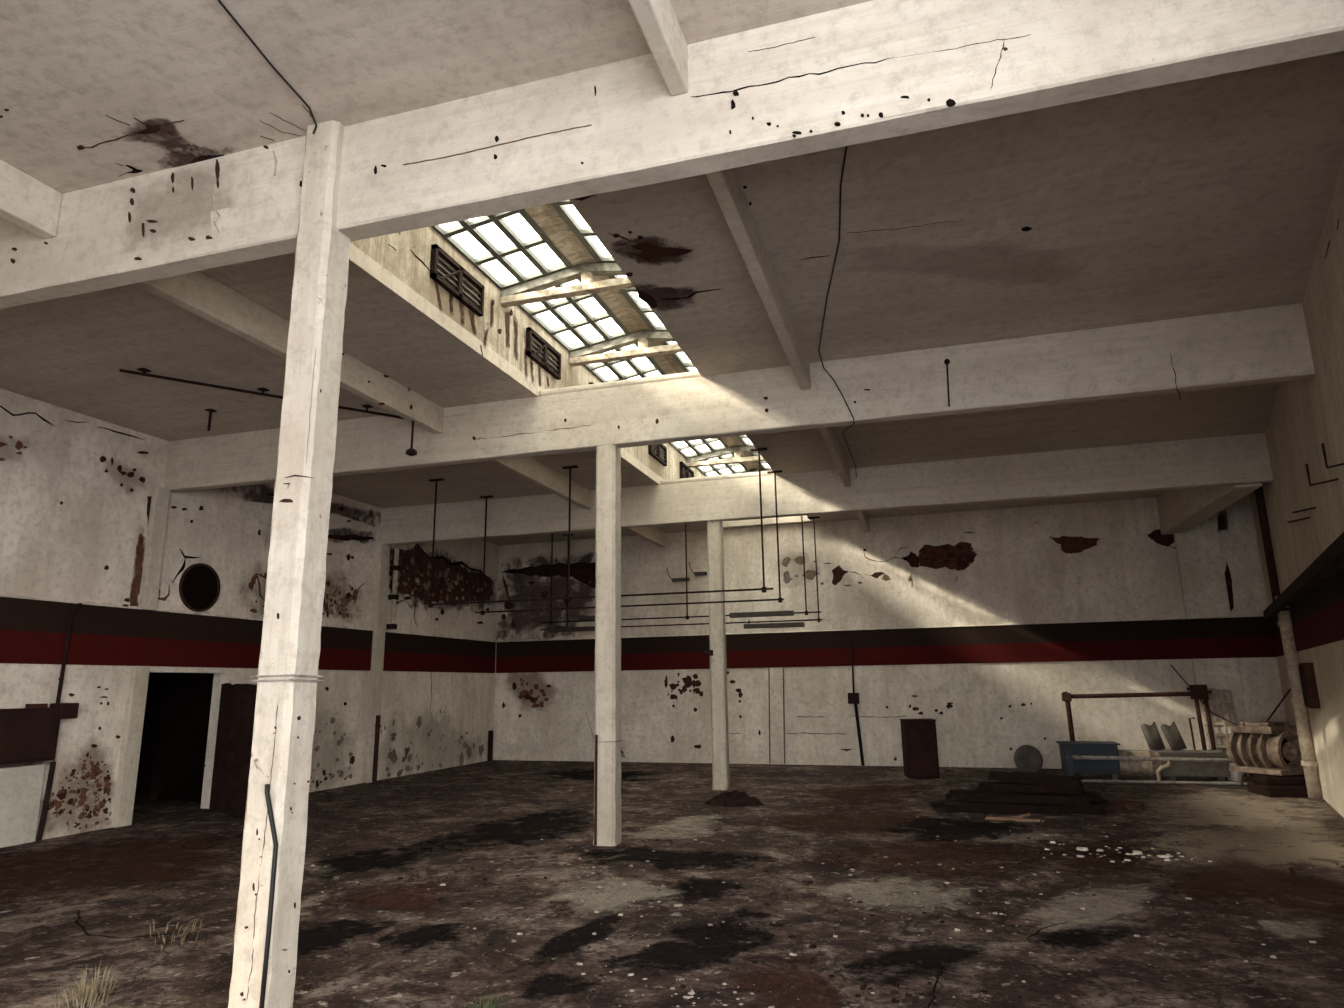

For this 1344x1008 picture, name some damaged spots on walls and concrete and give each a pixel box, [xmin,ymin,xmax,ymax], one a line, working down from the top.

crack [691,34,1031,97]
corrosion [122,496,152,607]
spalling [326,528,374,561]
spalling [781,532,978,588]
spalling [1049,536,1101,554]
spalling [1148,529,1176,549]
peeling [244,573,279,619]
peeling [322,577,364,619]
spalling [389,543,596,641]